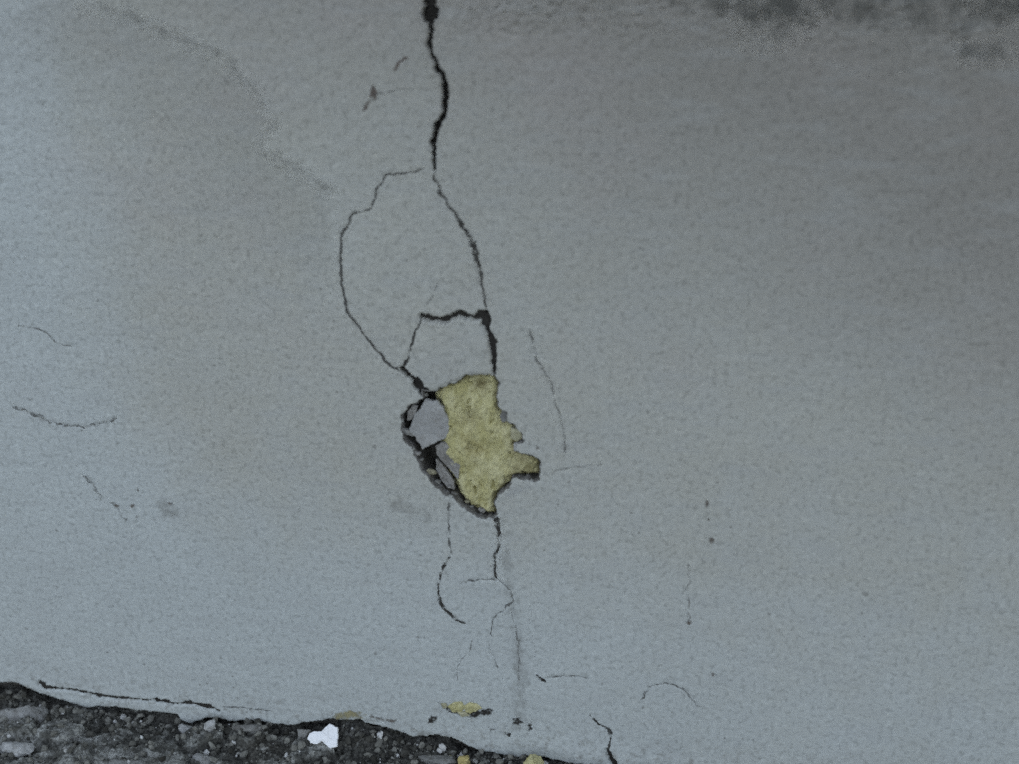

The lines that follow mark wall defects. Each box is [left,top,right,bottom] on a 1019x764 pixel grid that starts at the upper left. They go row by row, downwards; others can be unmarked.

crack [339,0,497,392]
spalling [400,374,541,519]
crack [437,504,465,624]
crack [457,517,518,678]
crack [593,718,617,764]